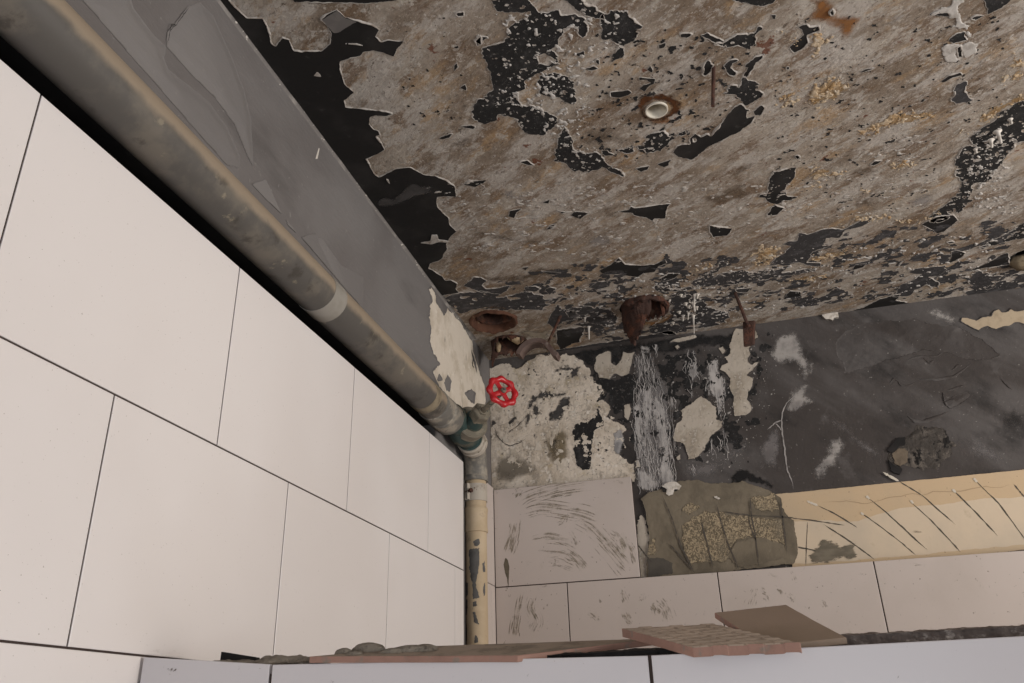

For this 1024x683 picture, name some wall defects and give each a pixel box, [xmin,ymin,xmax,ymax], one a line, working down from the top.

corrosion [813,1,859,34]
peeling [947,0,1010,58]
peeling [940,72,973,104]
corrosion [637,94,681,123]
peeling [856,100,1024,310]
peeling [221,0,872,496]
peeling [960,308,1024,331]
water stain [771,335,812,411]
water stain [491,344,733,494]
water stain [762,430,778,463]
water stain [816,439,842,476]